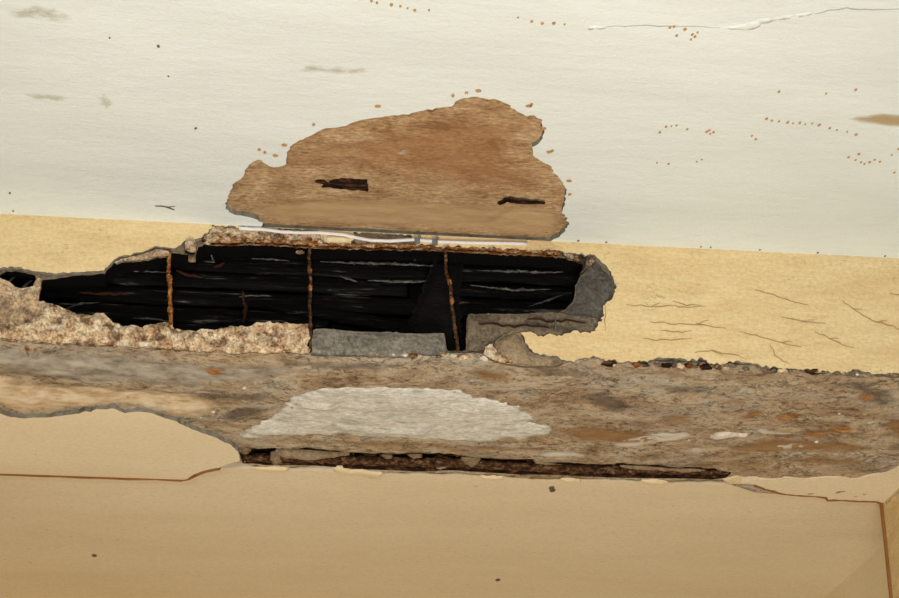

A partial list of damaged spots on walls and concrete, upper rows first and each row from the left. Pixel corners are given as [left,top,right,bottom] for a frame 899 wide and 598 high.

peeling [227,89,572,238]
corrosion [202,236,563,258]
crack [604,290,853,364]
crack [842,300,899,330]
spalling [0,249,899,494]